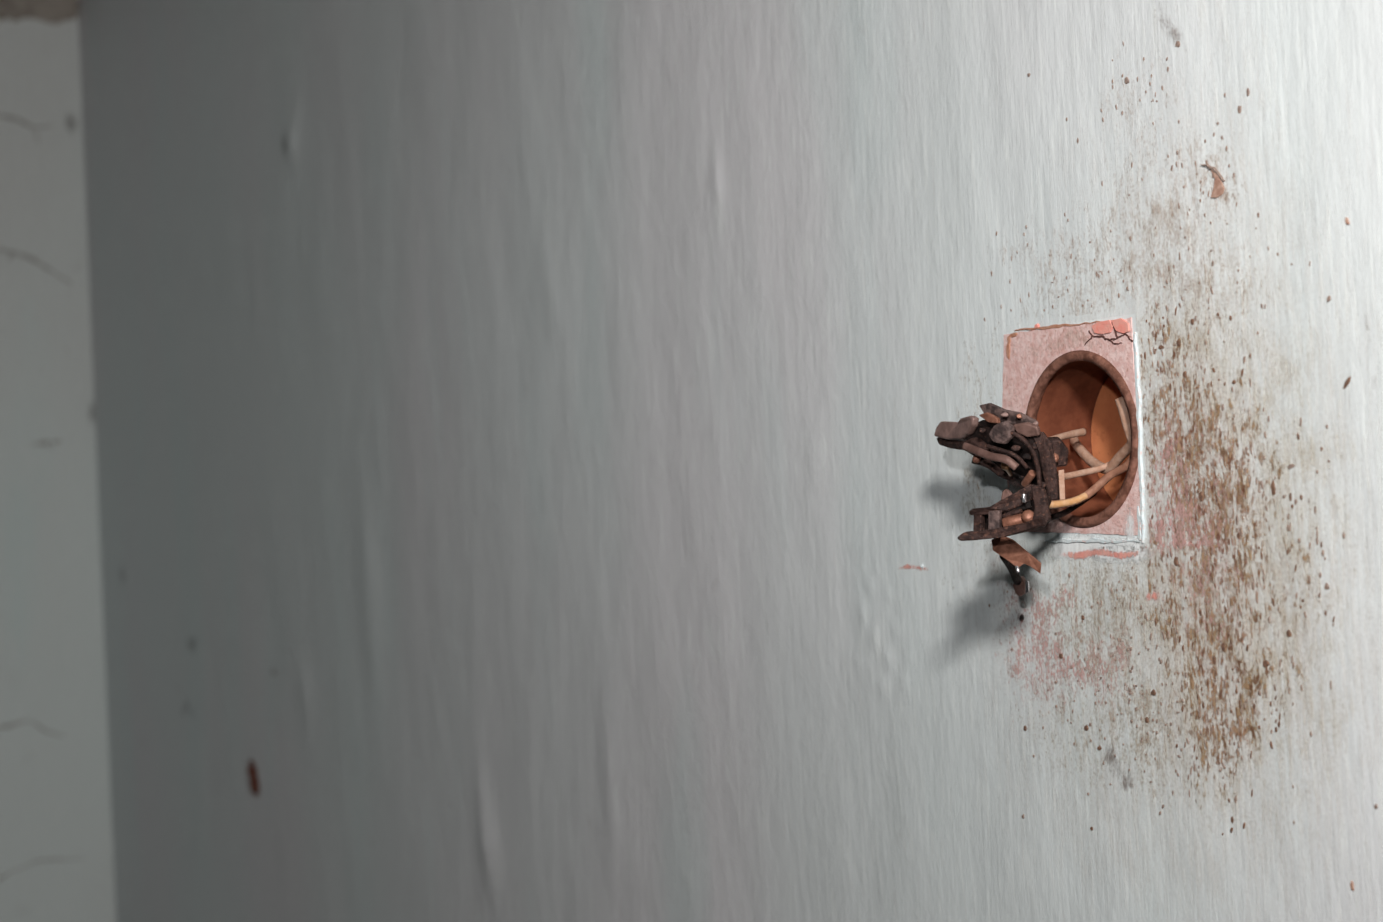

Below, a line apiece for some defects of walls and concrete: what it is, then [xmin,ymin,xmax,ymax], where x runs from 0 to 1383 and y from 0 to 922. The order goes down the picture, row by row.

flaking render [1002,317,1226,639]
leakage [1068,549,1138,559]
peeling [1009,590,1124,698]